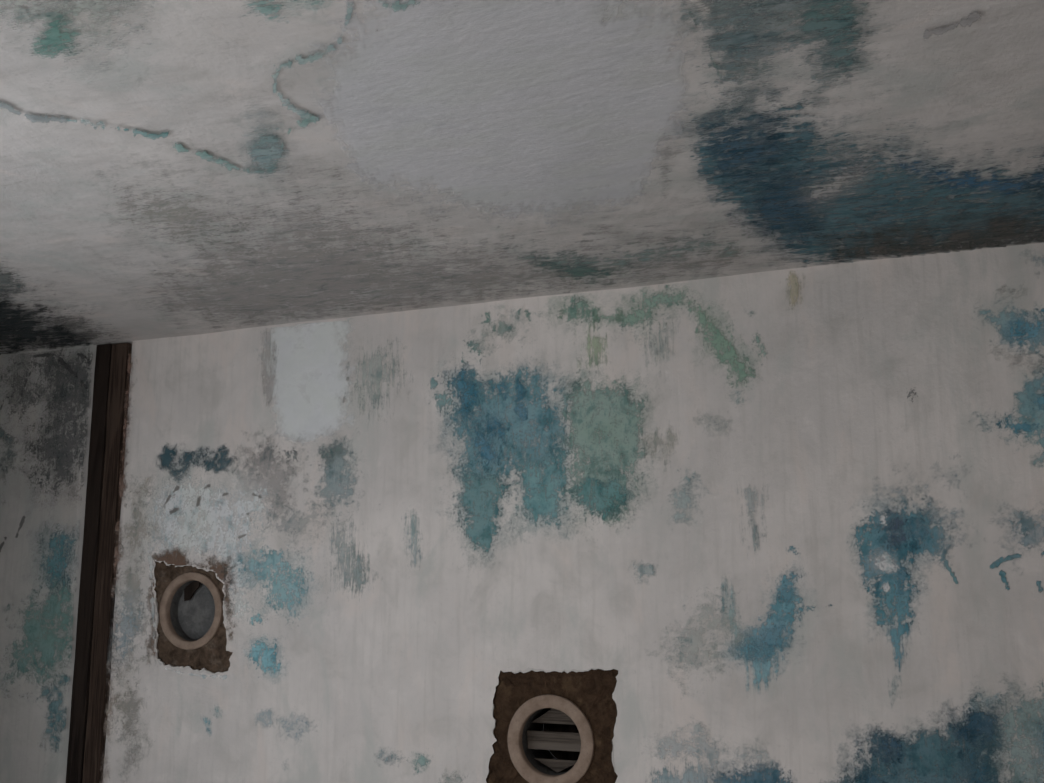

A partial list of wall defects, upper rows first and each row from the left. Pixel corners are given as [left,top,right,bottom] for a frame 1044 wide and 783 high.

crack [0,5,353,174]
damp [679,0,1044,304]
damp [7,533,77,751]
damp [0,271,117,495]
peeling [147,476,270,679]
damp [158,438,356,531]
damp [128,192,767,387]
damp [430,310,674,552]
spalling [486,668,618,783]
damp [651,724,792,783]
damp [855,490,958,671]
damp [830,682,1044,783]